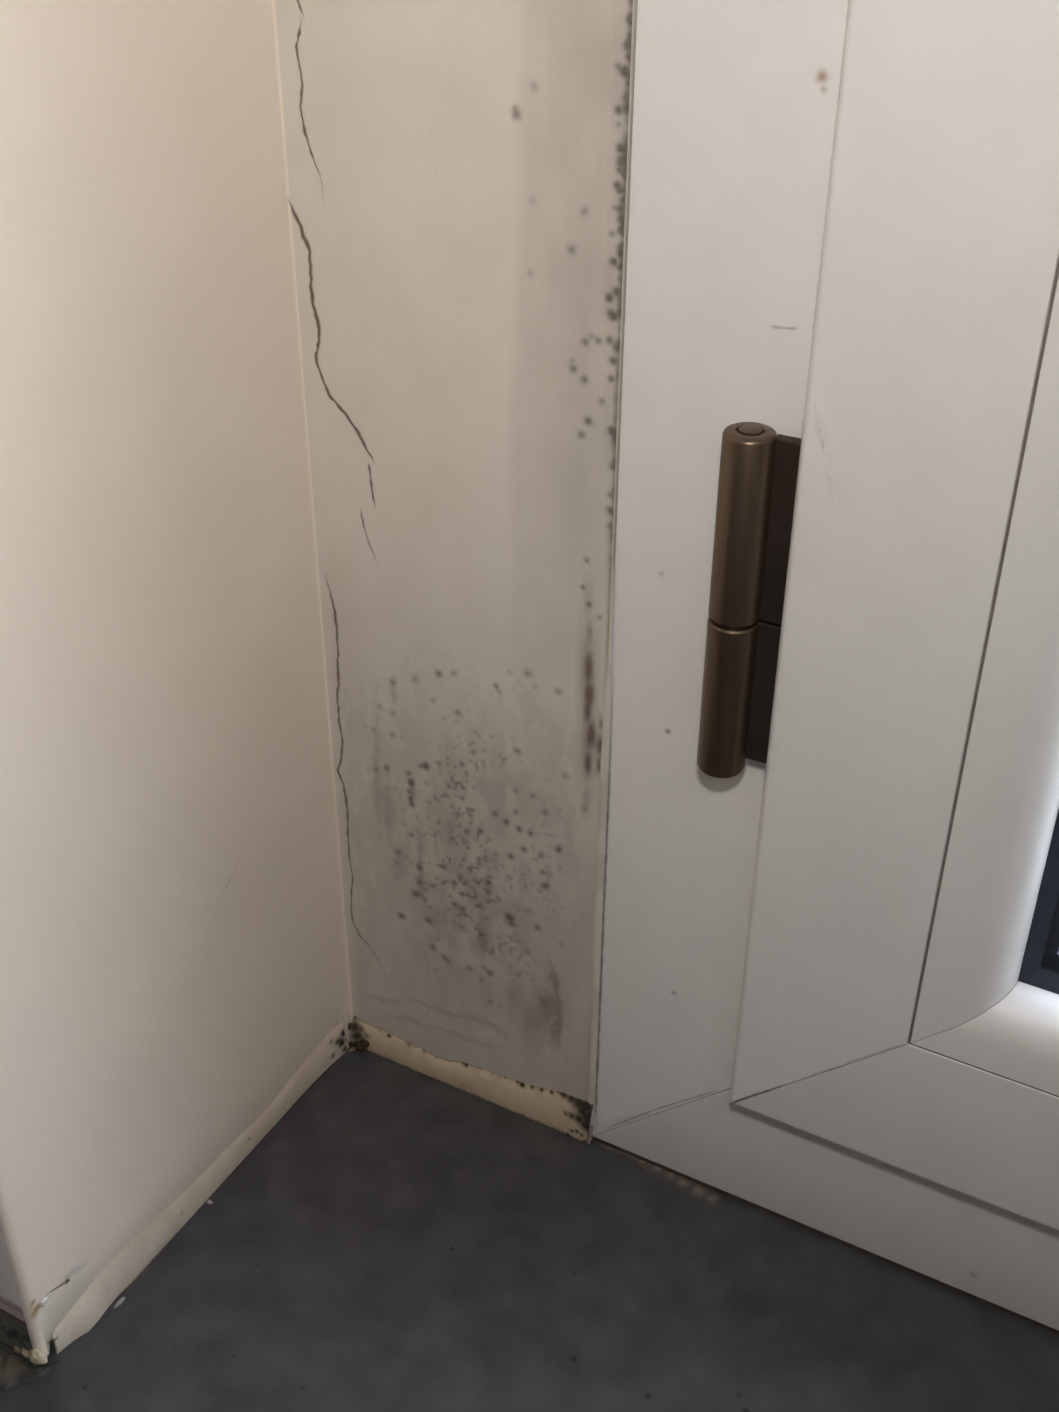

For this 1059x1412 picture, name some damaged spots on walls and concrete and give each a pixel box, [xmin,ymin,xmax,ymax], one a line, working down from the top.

crack [295,0,319,172]
mould [616,14,633,113]
crack [291,205,374,532]
mould [609,135,628,380]
crack [329,589,361,937]
water stain [585,657,602,771]